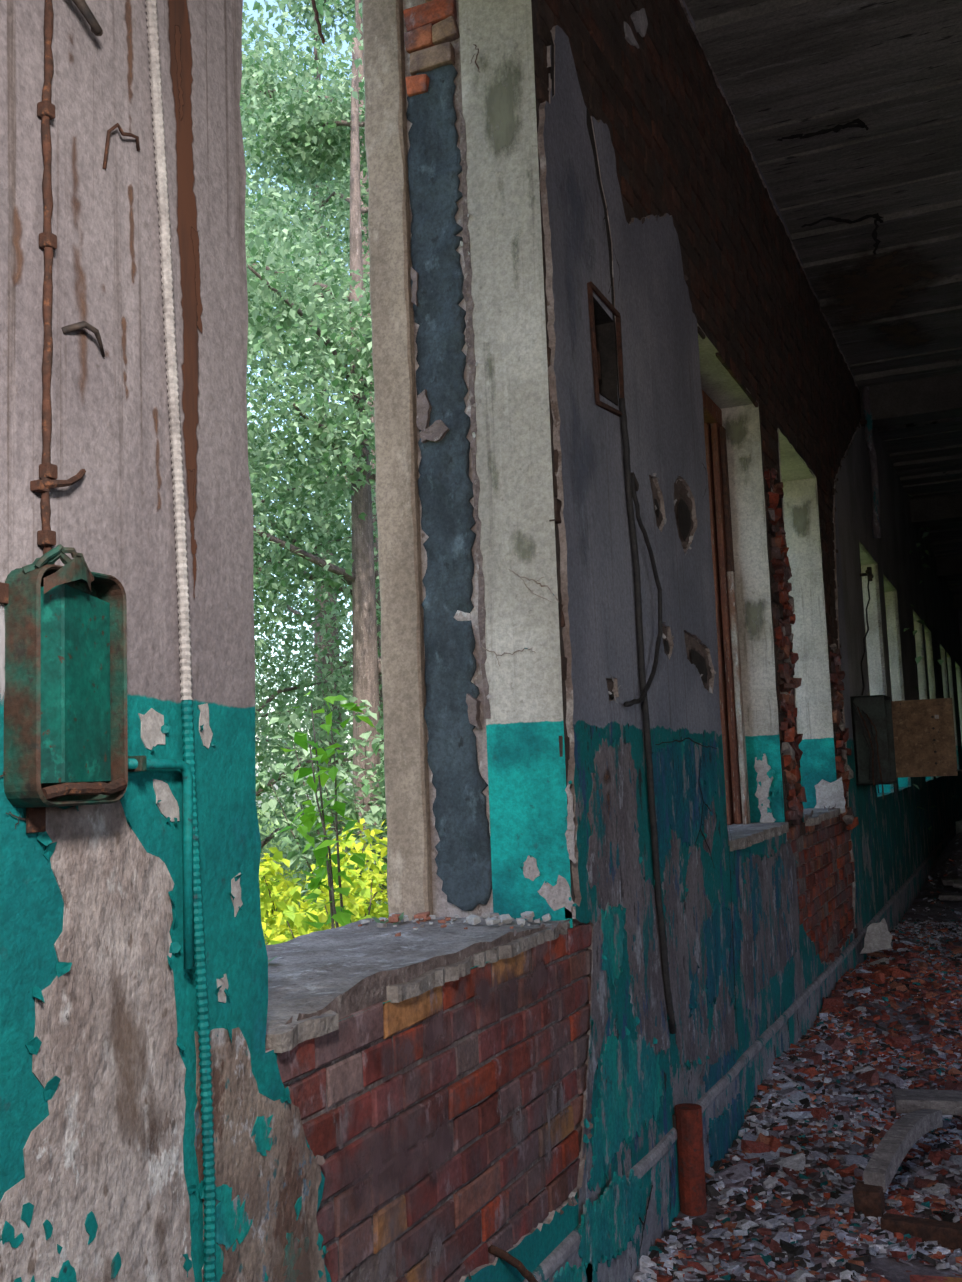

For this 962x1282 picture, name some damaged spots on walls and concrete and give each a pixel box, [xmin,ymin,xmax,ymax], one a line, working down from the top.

water stain [485,64,521,155]
crack [777,118,869,141]
corrosion [13,208,23,284]
corrosion [75,253,87,388]
corrosion [168,0,203,599]
crack [801,213,884,255]
flaking render [531,0,861,1010]
flaking render [0,378,736,1282]